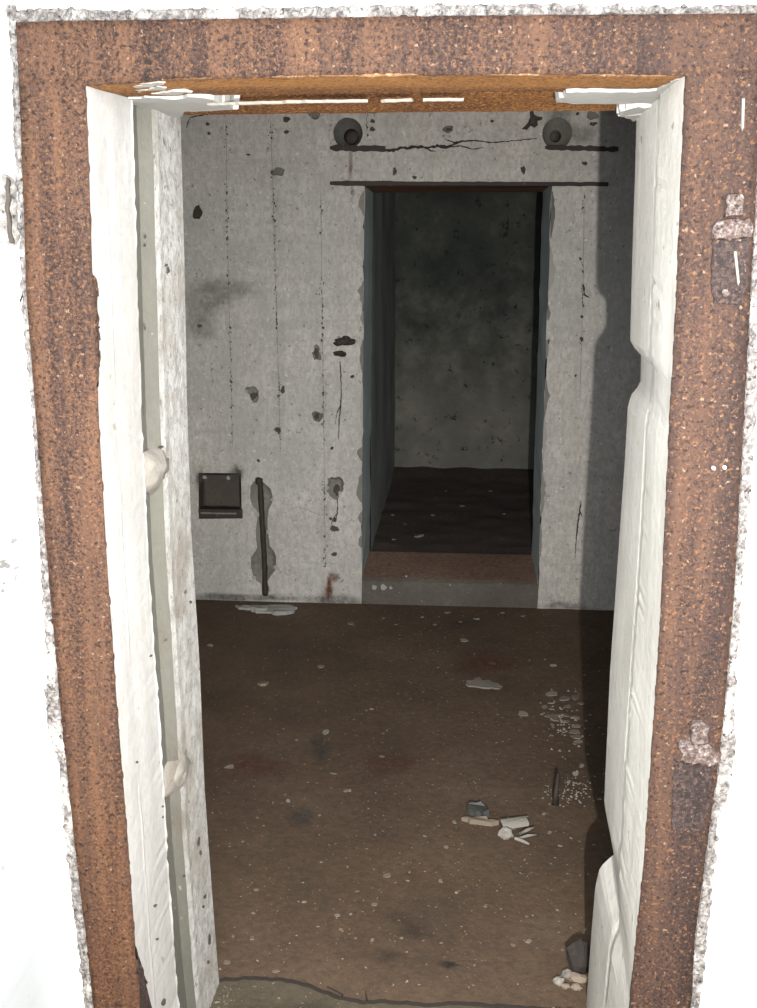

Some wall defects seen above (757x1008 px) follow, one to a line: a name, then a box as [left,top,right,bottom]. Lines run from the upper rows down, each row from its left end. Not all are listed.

peeling [128,81,376,137]
crack [386,138,537,152]
spalling [522,111,543,130]
spalling [228,326,259,443]
spalling [250,481,278,595]
spalling [322,477,344,567]
peeling [135,946,166,1008]